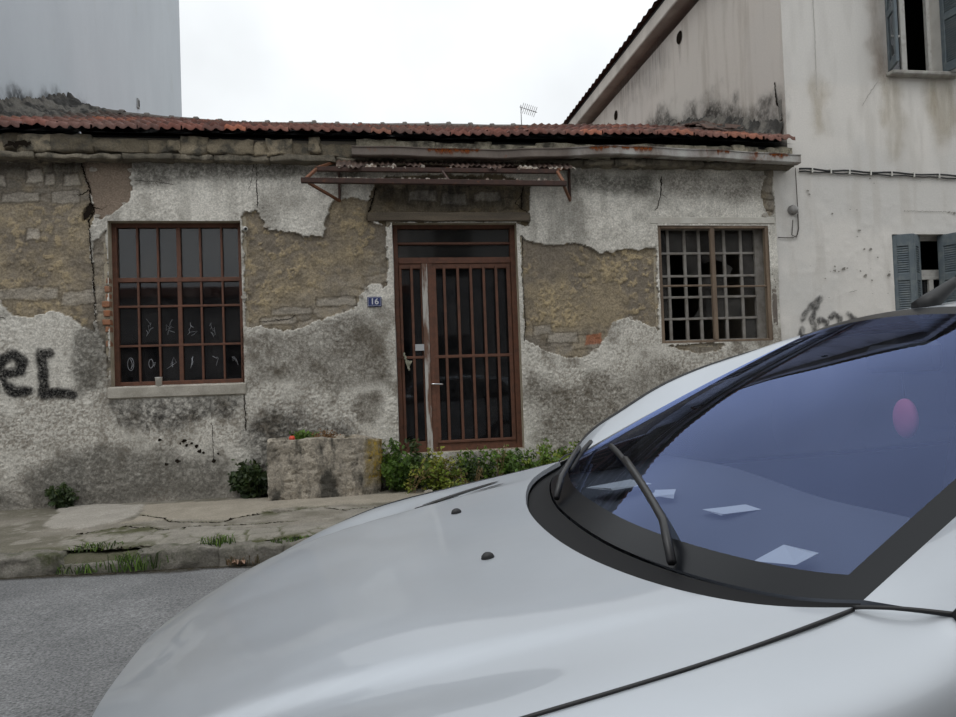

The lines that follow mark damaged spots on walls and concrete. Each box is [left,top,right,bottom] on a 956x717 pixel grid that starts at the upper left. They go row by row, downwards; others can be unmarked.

damp [691,104,740,119]
peeling [0,161,133,377]
crack [77,163,104,321]
peeling [241,173,660,358]